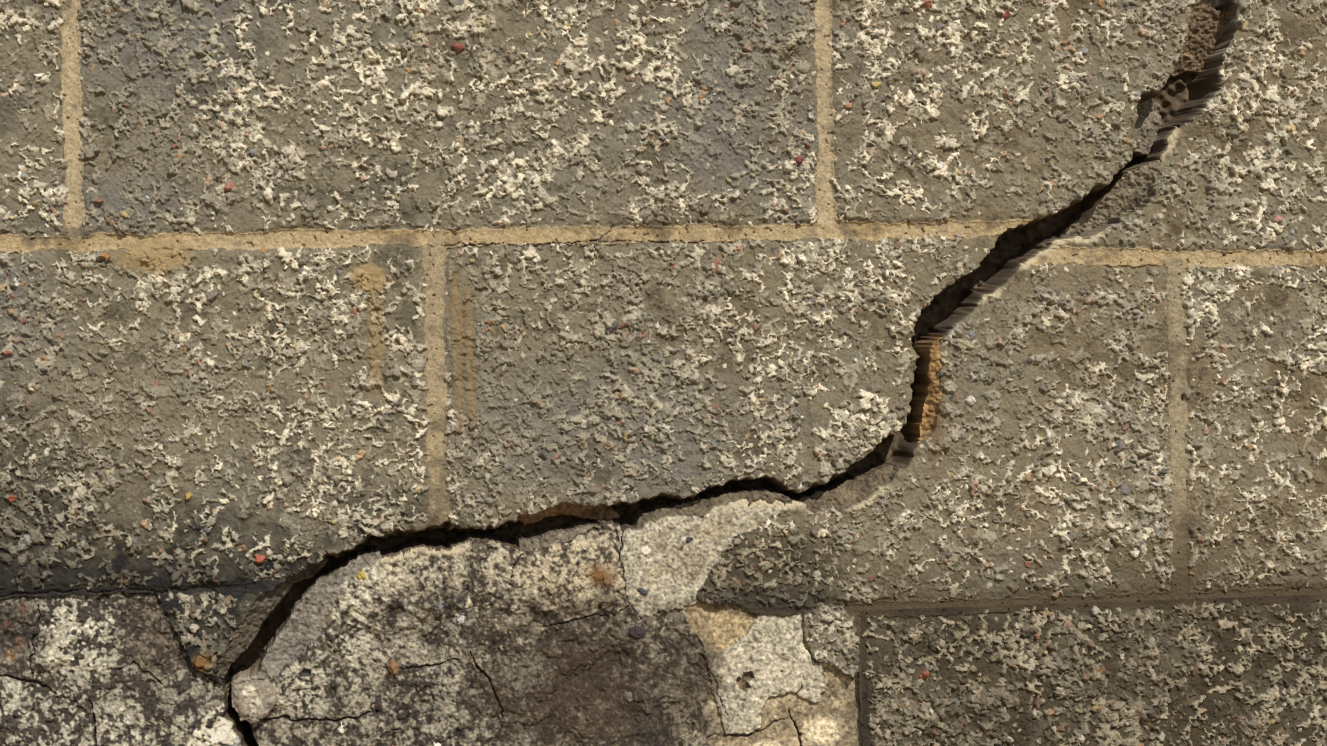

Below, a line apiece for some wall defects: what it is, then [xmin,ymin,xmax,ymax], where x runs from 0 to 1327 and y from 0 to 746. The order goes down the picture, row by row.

crack [216,0,1238,746]